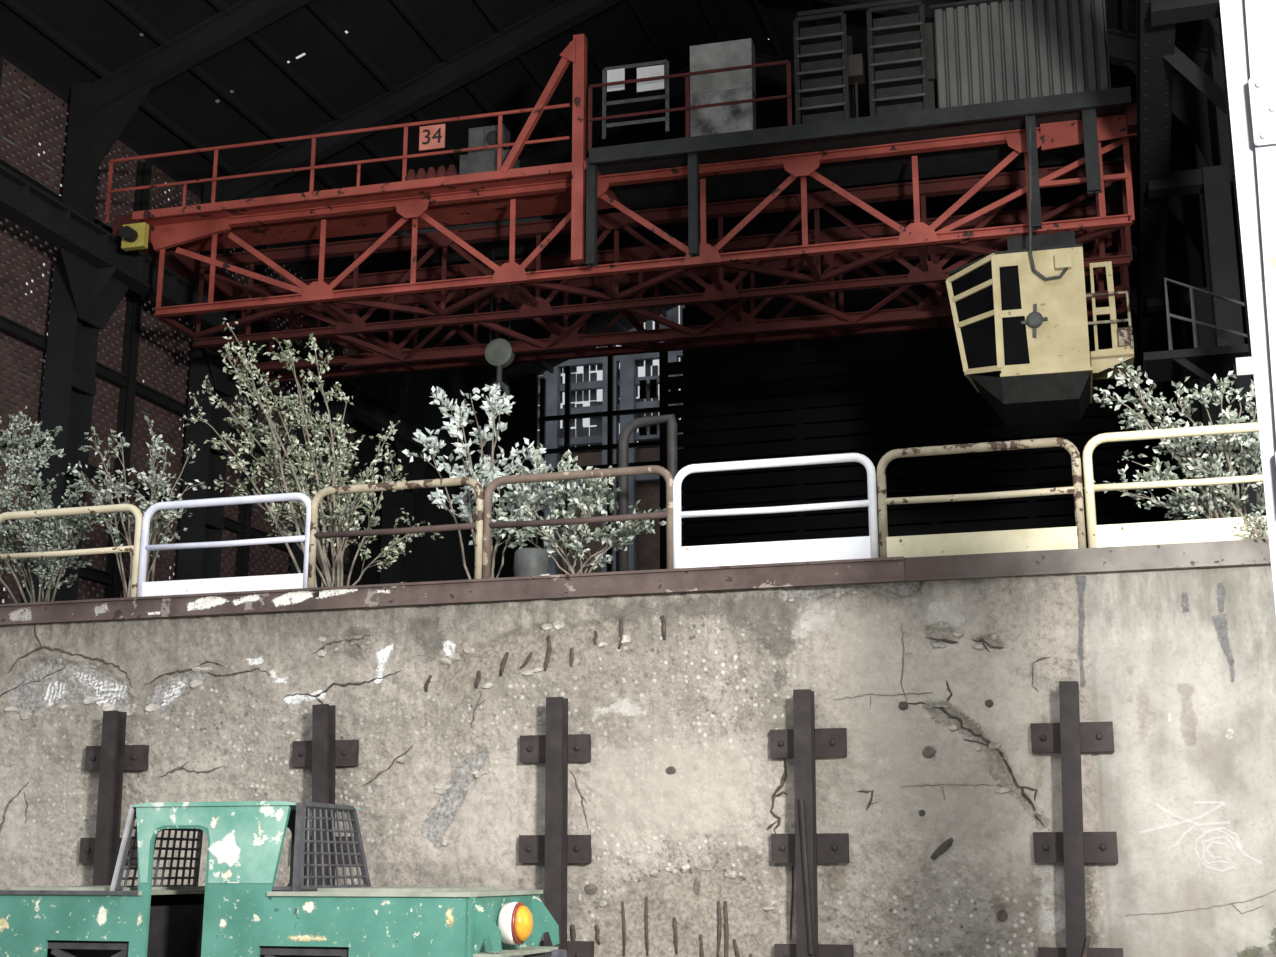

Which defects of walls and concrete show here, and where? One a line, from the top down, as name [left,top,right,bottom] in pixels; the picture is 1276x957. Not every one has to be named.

spalling [4,659,213,720]
crack [0,624,402,704]
peeling [187,588,358,611]
crack [833,623,1050,830]
water stain [1212,583,1234,682]